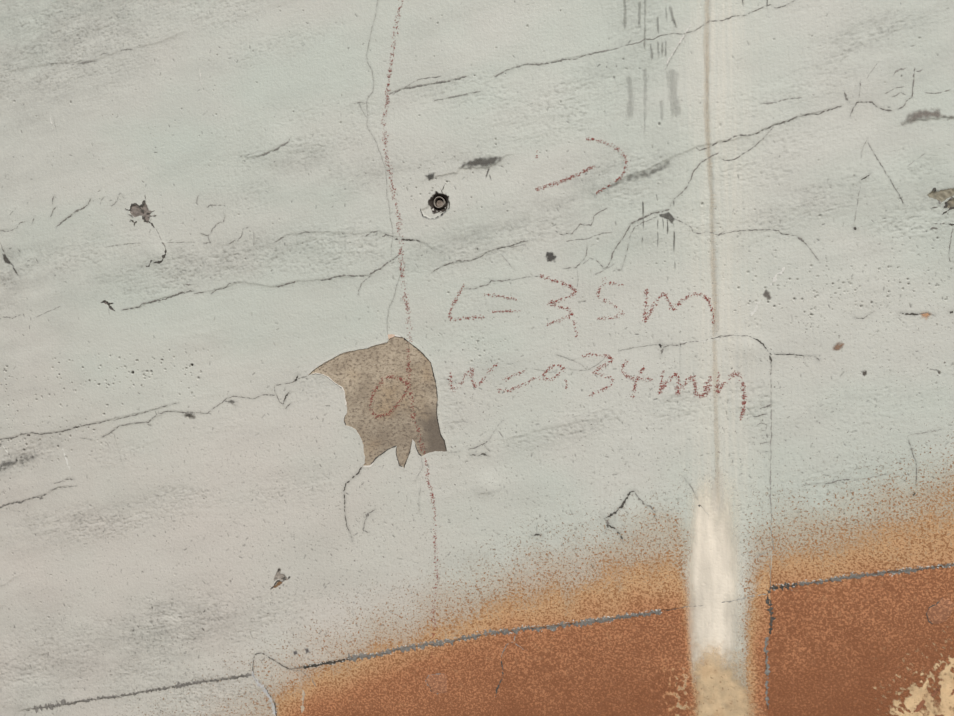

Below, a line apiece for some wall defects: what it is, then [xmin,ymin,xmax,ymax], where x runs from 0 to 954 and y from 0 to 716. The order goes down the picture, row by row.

crack [324,0,795,343]
crack [556,64,951,287]
crack [123,282,239,310]
peeling [304,331,450,472]
crack [0,335,954,716]
water stain [690,490,749,716]
peeling [885,657,954,716]